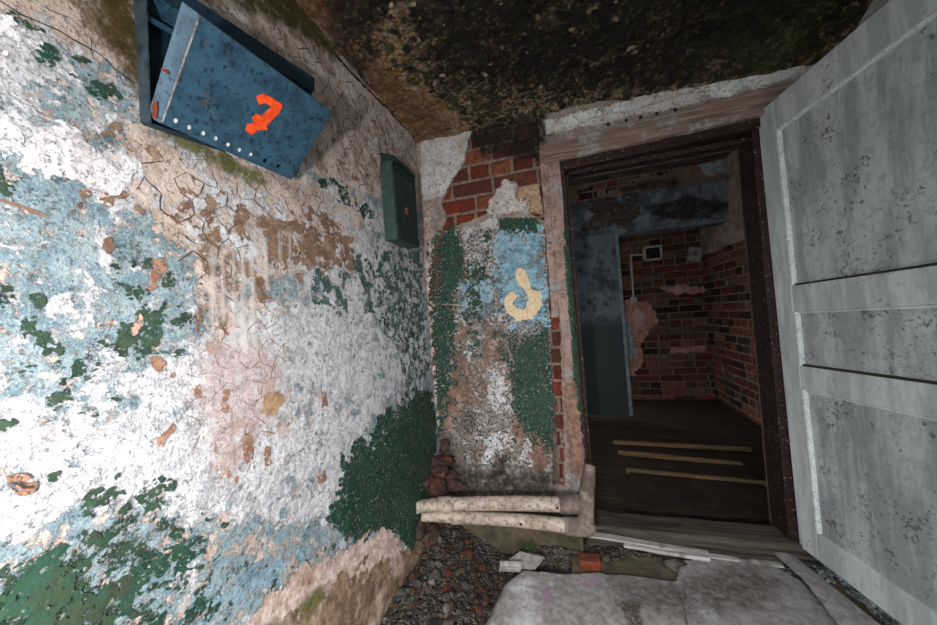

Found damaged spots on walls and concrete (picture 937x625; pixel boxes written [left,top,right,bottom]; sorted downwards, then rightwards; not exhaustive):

peeling [0,10,123,101]
leakage [231,0,449,139]
peeling [378,2,421,23]
peeling [376,24,447,90]
leakage [408,0,839,100]
crack [137,141,334,464]
peeling [0,64,807,625]